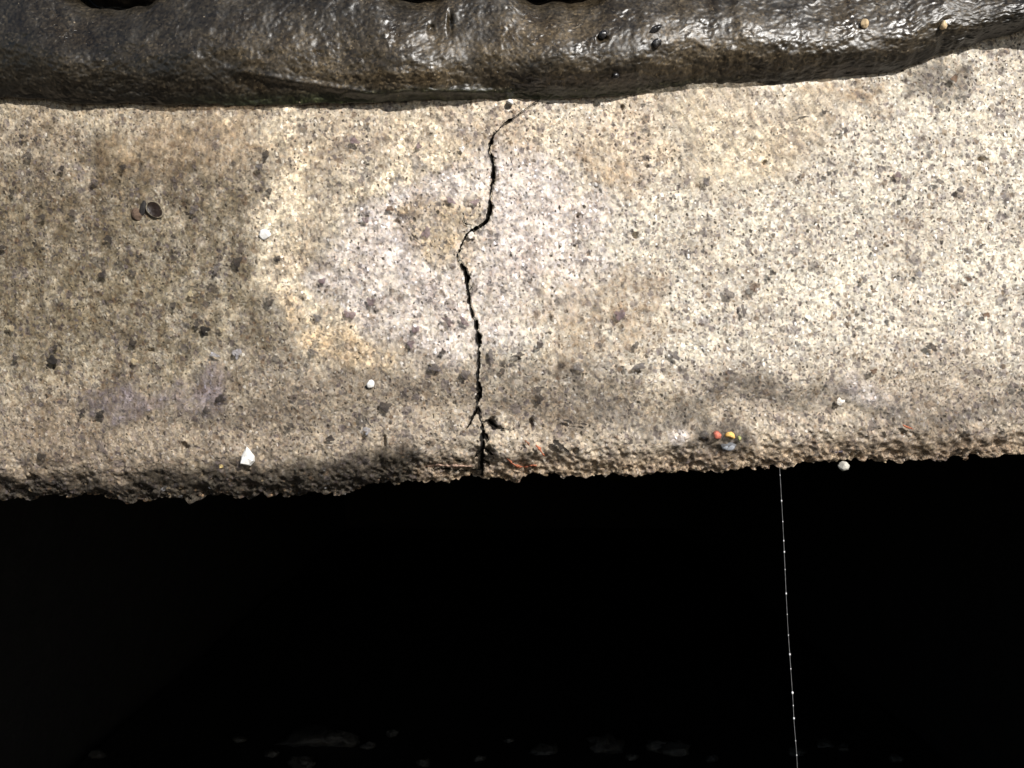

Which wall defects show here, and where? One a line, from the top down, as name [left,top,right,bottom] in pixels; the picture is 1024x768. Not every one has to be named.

crack [436,99,540,475]